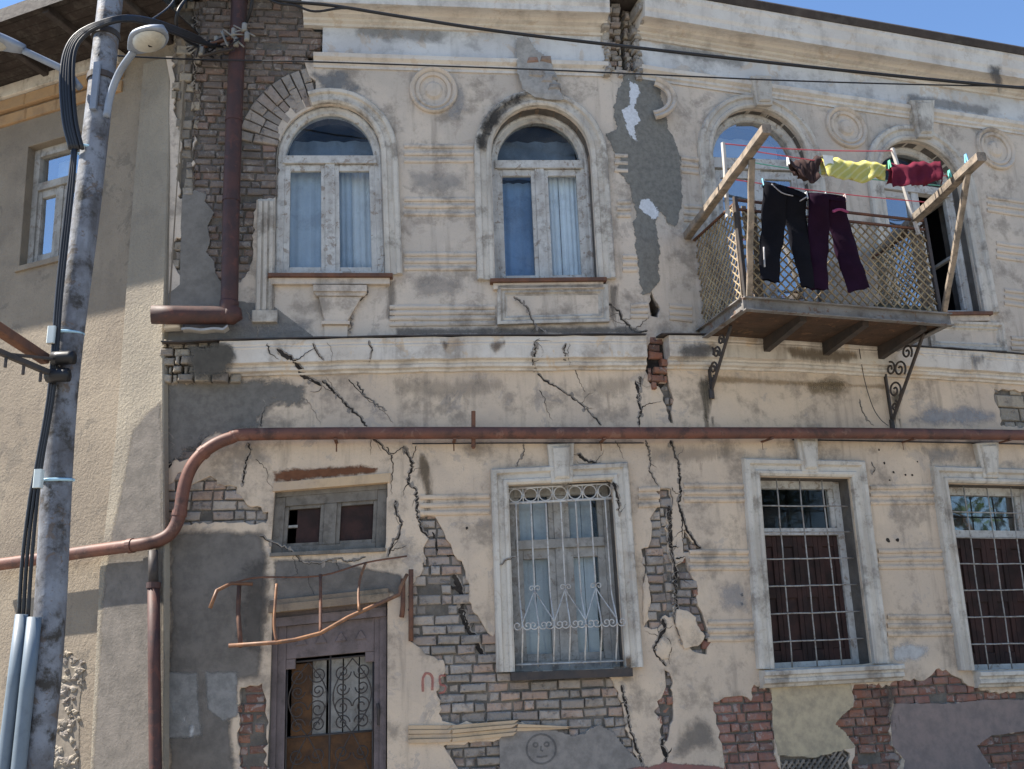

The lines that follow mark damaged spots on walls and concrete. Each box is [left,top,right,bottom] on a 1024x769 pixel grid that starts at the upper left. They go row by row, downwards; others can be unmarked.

spalling [239,0,323,283]
leakage [476,92,527,149]
crack [514,296,602,425]
crack [604,283,648,333]
spalling [645,337,673,423]
spalling [184,476,268,525]
crack [246,286,487,654]
crack [562,376,703,666]
spalling [641,488,711,654]
spalling [408,516,636,757]
crack [618,685,672,769]
spalling [713,669,1024,769]